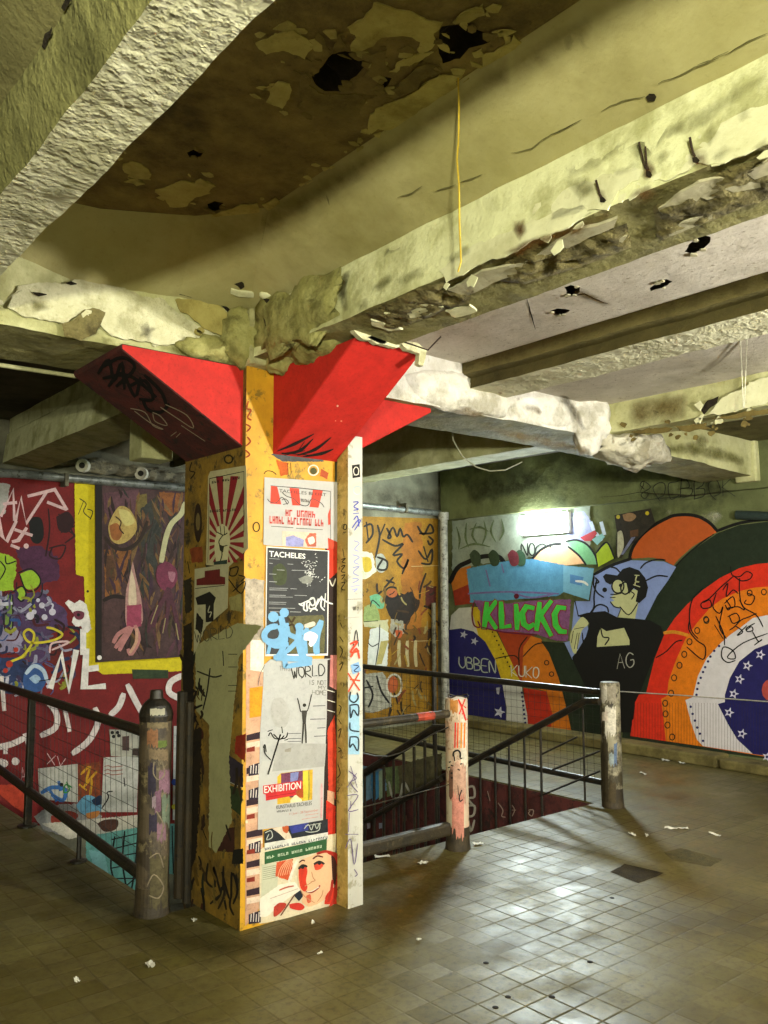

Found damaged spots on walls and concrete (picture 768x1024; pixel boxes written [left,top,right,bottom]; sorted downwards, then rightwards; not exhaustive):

peeling [249,2,521,153]
crack [513,33,767,153]
peeling [0,279,227,347]
peeling [117,151,280,217]
spalling [230,282,269,303]
peeling [350,104,768,367]